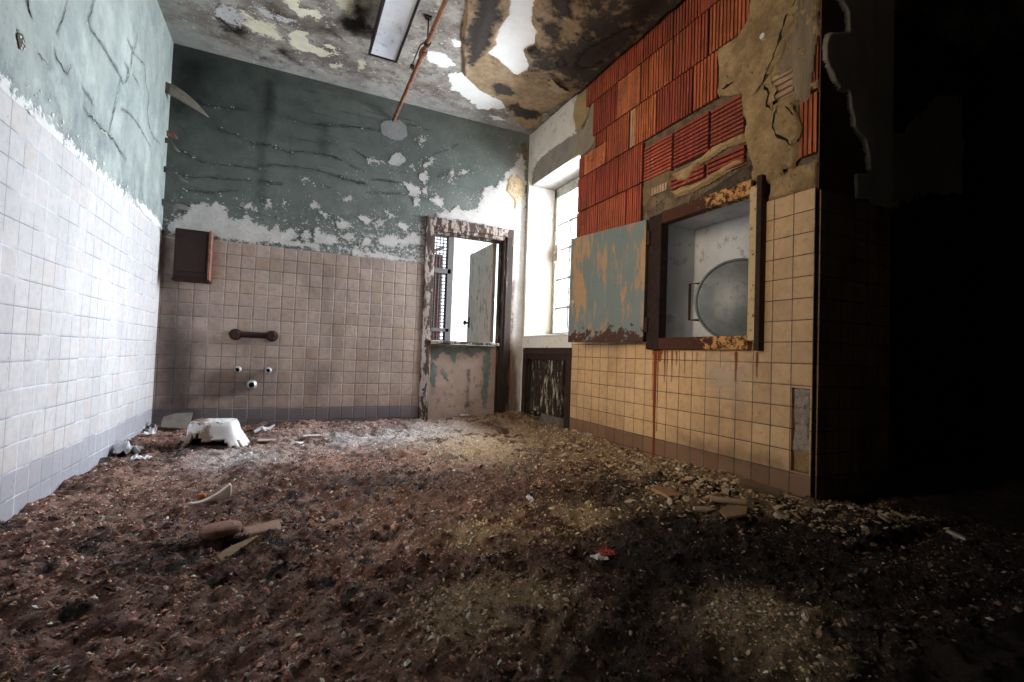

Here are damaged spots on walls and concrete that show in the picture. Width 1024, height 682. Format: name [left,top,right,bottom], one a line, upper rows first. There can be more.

crack [38,0,158,158]
crack [175,104,405,195]
flaking render [65,0,876,413]
crack [753,0,799,146]
rust [652,350,685,457]
peeling [793,388,810,474]